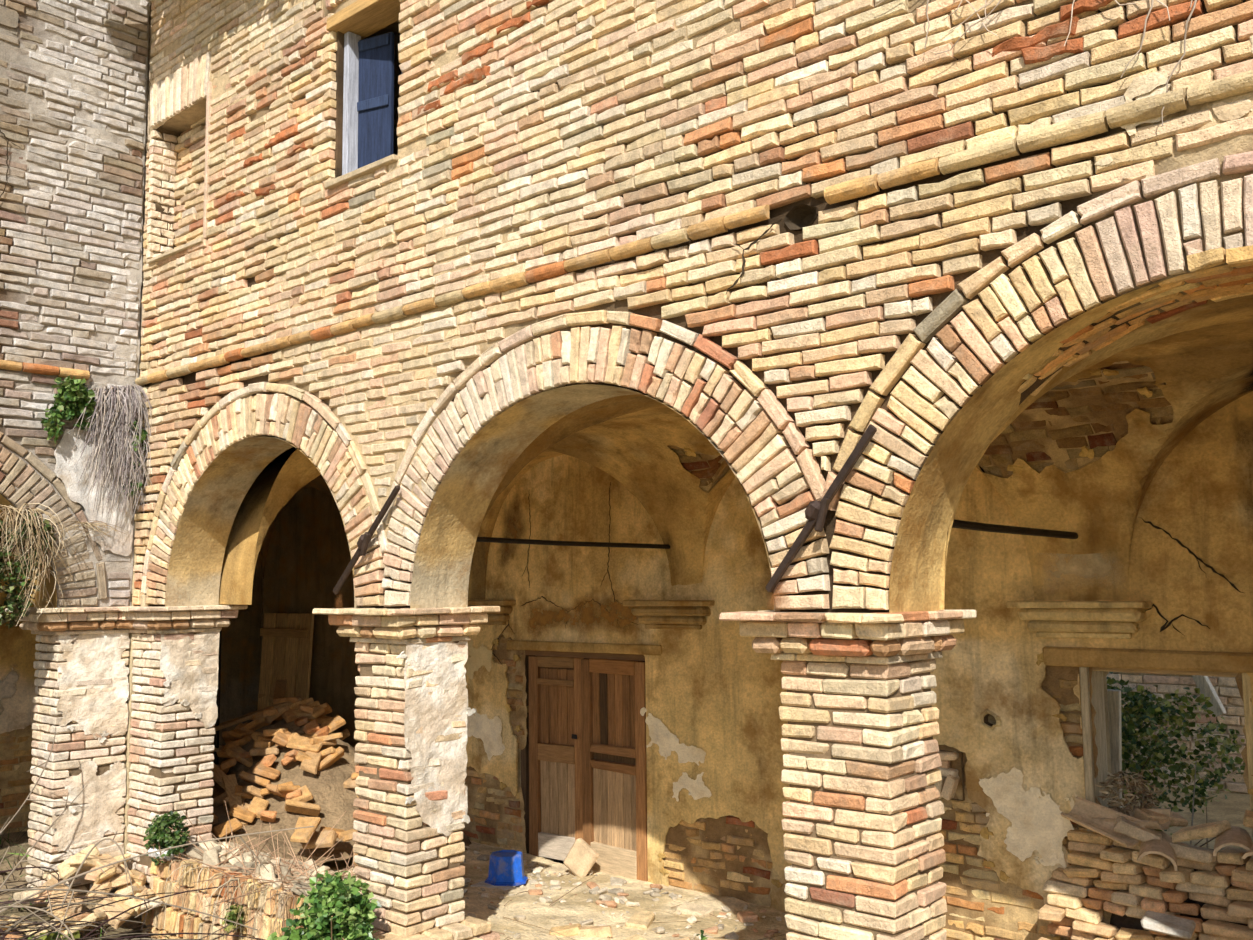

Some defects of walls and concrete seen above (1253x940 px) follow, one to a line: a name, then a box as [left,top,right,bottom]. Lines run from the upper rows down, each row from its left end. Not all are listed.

flaking render [978,245,1253,479]
crack [491,482,638,664]
crack [1145,604,1210,633]
crack [1139,517,1244,593]
flaking render [0,725,36,835]
peeling [51,760,126,864]
peeling [56,633,130,743]
peeling [160,631,220,728]
peeling [396,634,529,854]
flaking render [657,815,783,906]
flaking render [935,744,1087,940]
flaking render [1036,653,1099,778]